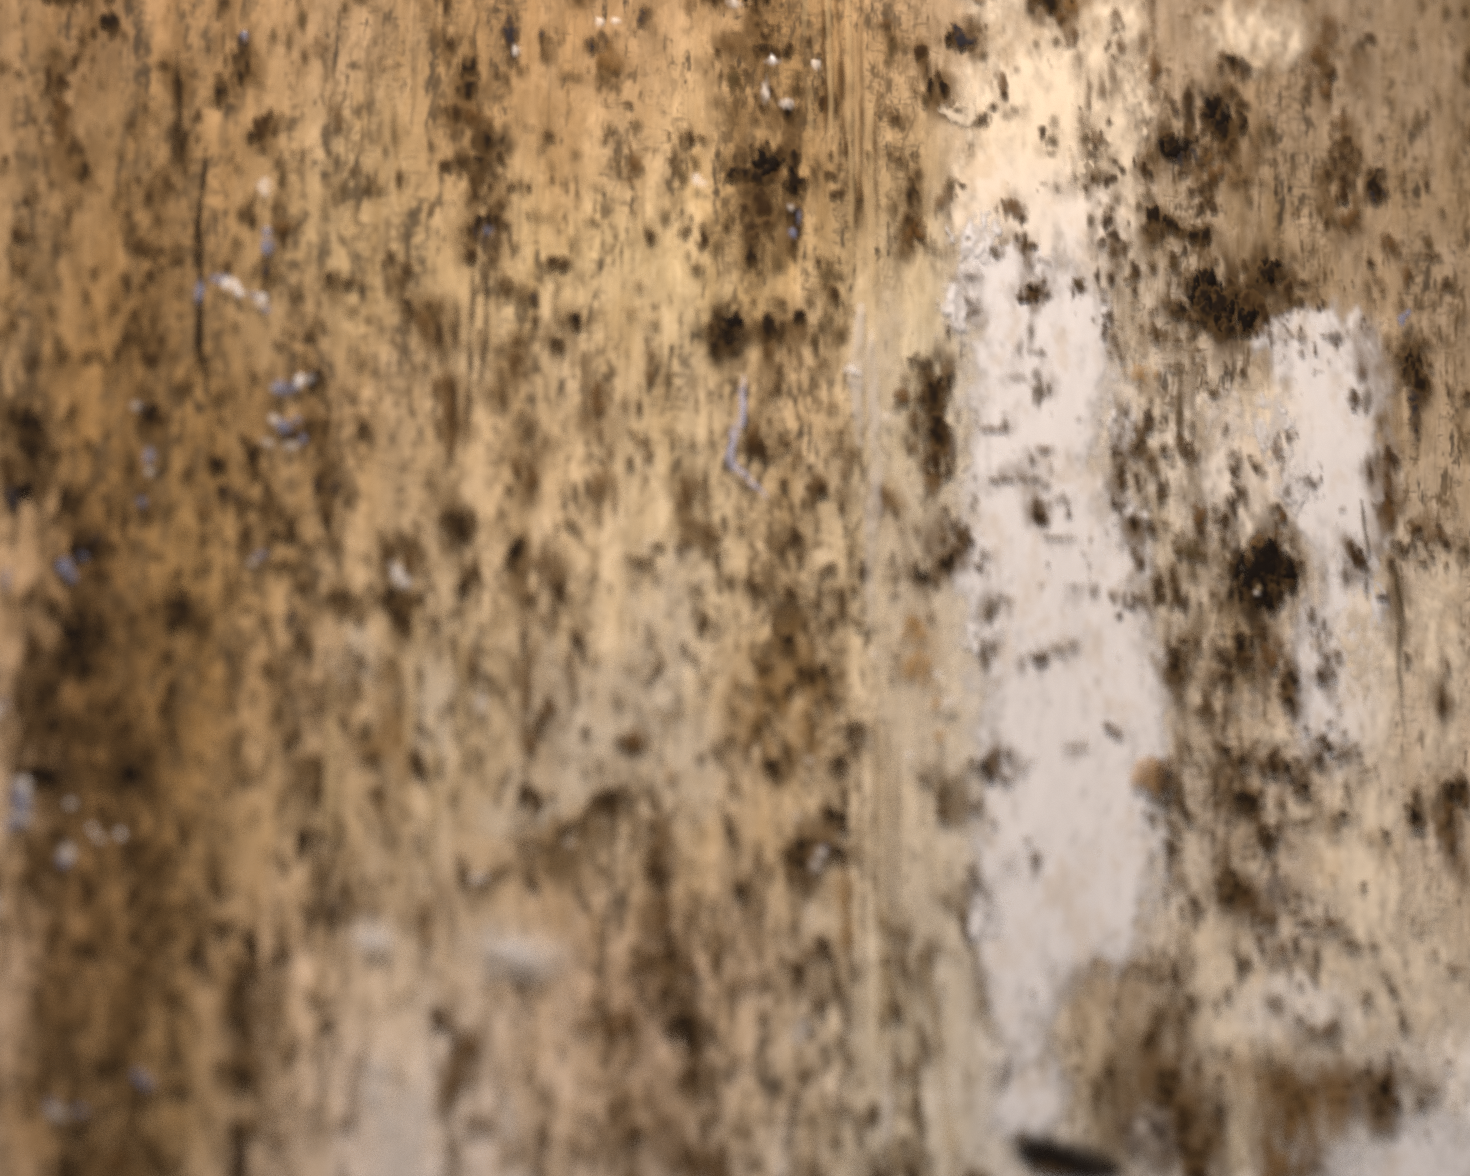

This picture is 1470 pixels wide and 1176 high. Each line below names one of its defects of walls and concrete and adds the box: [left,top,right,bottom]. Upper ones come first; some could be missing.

damp [881,15,986,111]
damp [978,72,1008,124]
damp [32,0,258,464]
damp [684,80,863,271]
damp [890,153,965,253]
damp [1001,198,1038,251]
damp [706,285,840,391]
damp [1016,280,1049,302]
damp [187,324,375,590]
damp [912,507,982,586]
damp [1072,52,1376,972]
damp [0,402,314,1176]